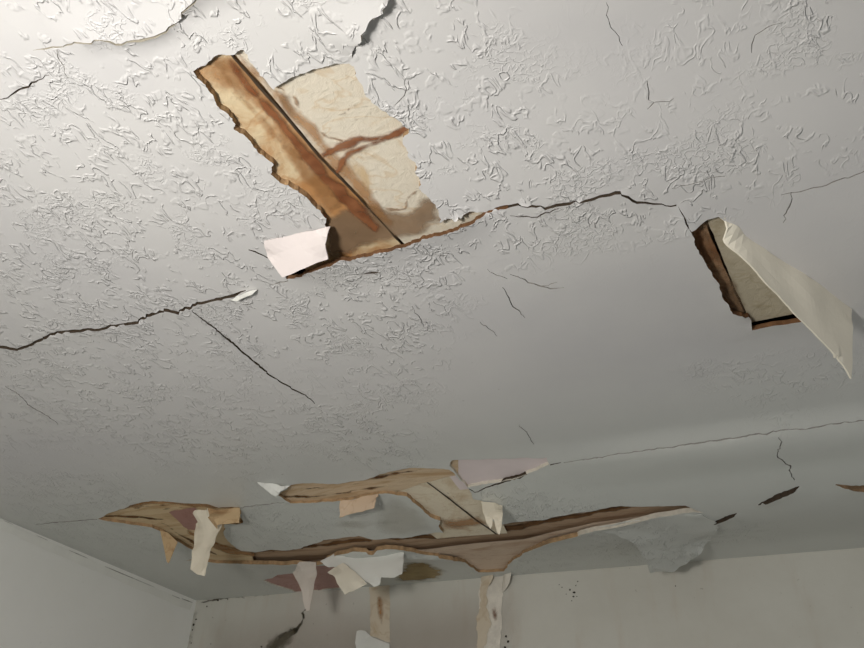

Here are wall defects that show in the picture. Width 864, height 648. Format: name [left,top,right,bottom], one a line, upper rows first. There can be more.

spalling [194,35,509,279]
crack [508,176,725,218]
crack [782,171,864,223]
crack [488,270,564,318]
spalling [679,209,853,379]
crack [0,290,315,404]
crack [564,420,864,505]
spalling [99,501,255,576]
spalling [257,458,718,648]
crack [714,513,737,525]
damp [261,610,305,648]